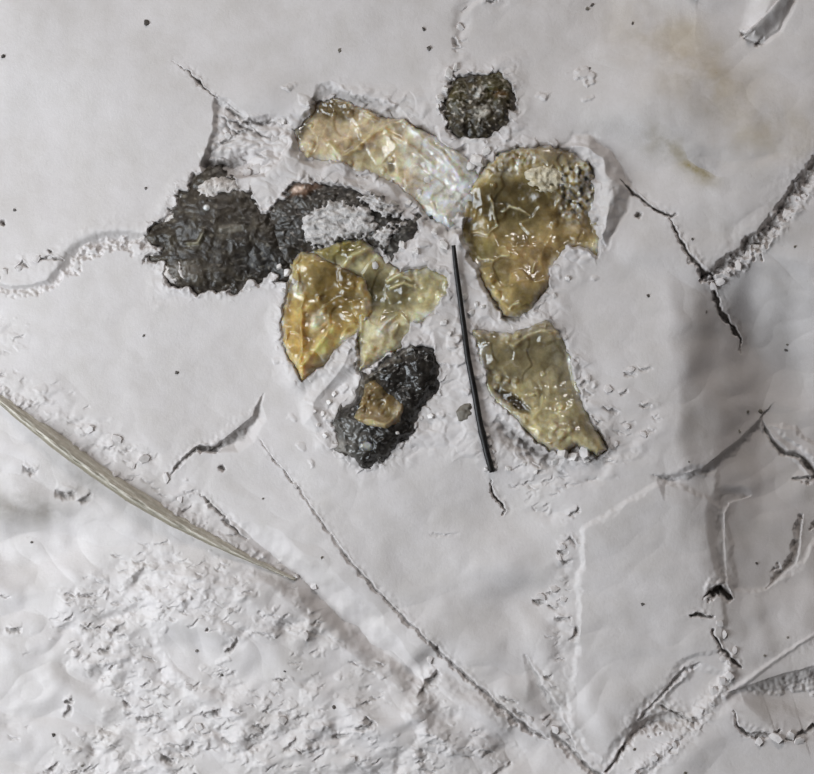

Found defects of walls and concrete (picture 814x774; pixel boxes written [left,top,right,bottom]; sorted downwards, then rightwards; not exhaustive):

crack [179,65,218,98]
peeling [164,262,184,284]
peeling [197,164,262,197]
crack [620,149,814,354]
spalling [0,372,251,547]
spalling [0,541,523,774]
crack [171,394,701,774]
spalling [456,403,472,421]
spalling [514,400,669,691]
crack [654,413,814,696]
crack [733,710,814,746]